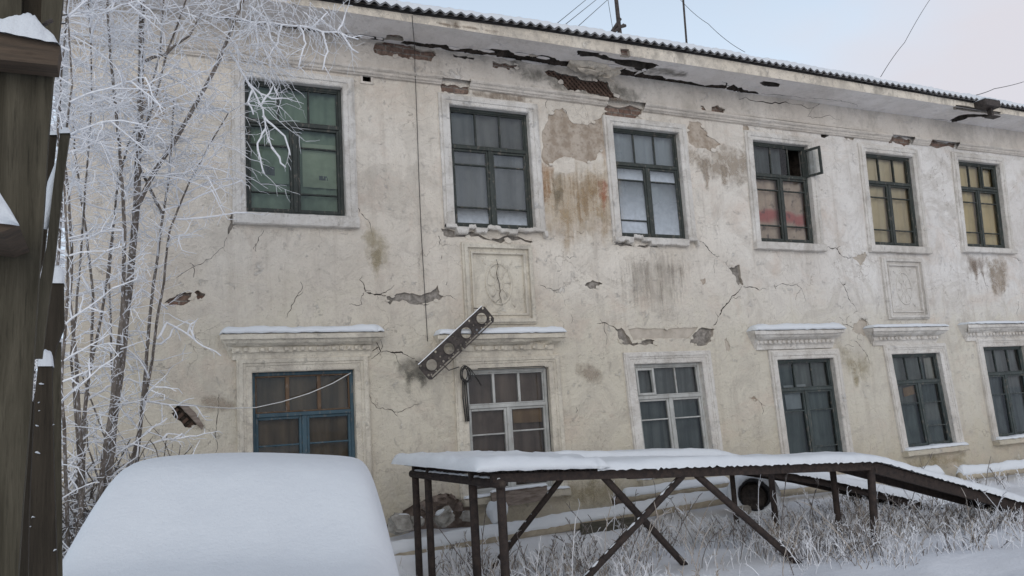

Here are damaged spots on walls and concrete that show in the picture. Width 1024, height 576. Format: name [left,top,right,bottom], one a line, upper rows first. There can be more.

spalling [373,42,439,61]
spalling [493,61,519,70]
spalling [441,82,469,95]
flaking render [541,94,643,166]
damp [694,153,747,187]
spalling [164,290,205,306]
crack [356,277,390,306]
spalling [385,285,444,305]
crack [700,241,806,325]
damp [970,259,1006,292]
flaking render [614,324,730,351]
crack [372,342,414,363]